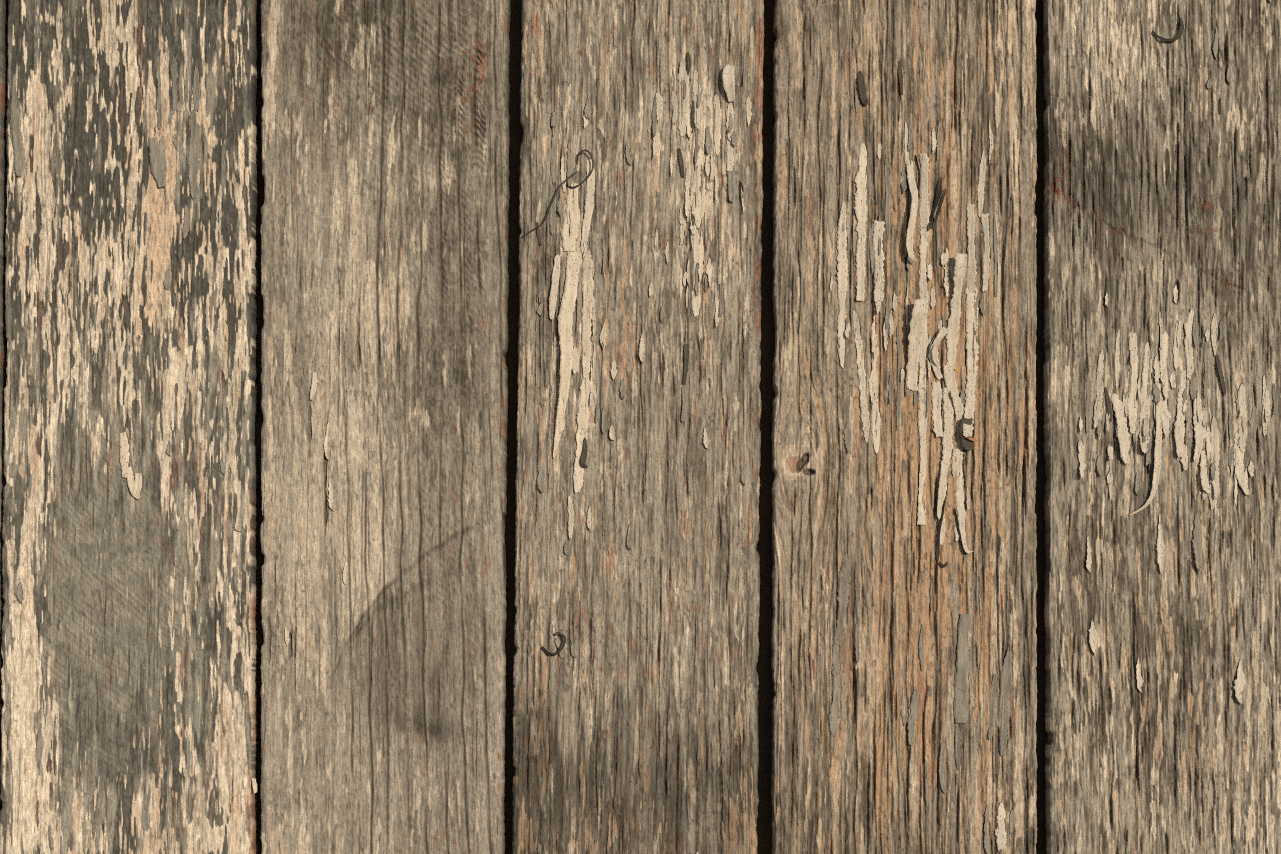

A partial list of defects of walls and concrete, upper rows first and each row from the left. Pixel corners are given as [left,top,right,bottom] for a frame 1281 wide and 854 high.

peeling [4,0,294,500]
peeling [531,111,626,556]
peeling [639,48,758,422]
peeling [830,0,1037,567]
peeling [1054,0,1185,145]
peeling [1078,285,1278,574]
peeling [0,488,432,854]